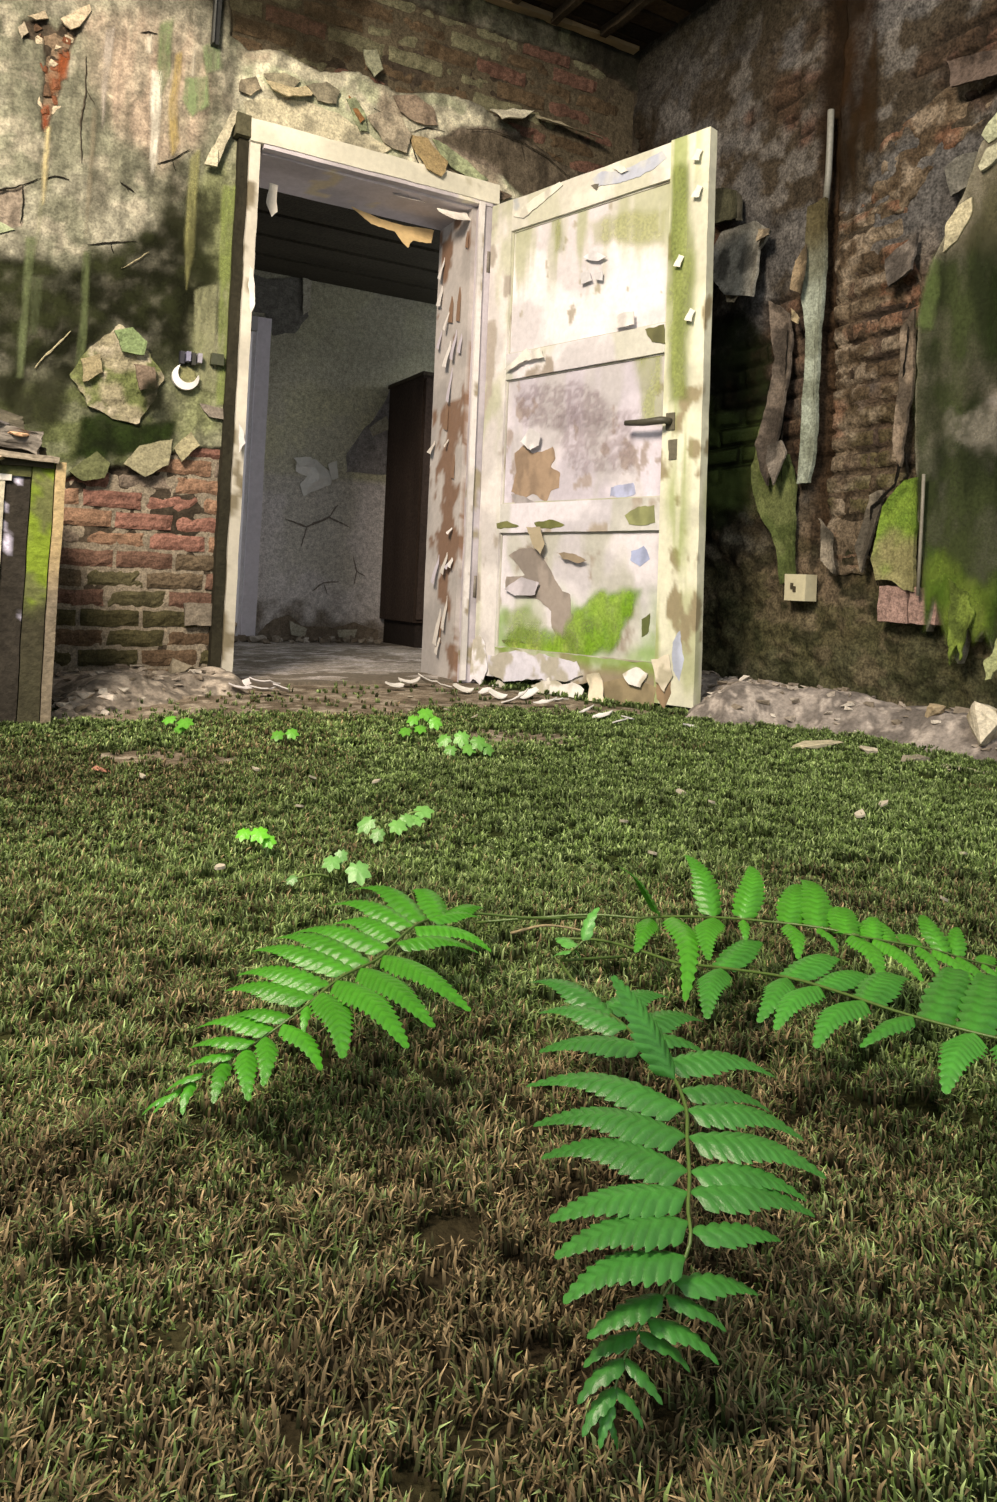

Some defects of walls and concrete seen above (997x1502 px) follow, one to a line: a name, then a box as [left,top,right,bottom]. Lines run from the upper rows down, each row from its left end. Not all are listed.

crack [0,61,95,223]
corrosion [59,54,68,78]
peeling [352,207,434,247]
peeling [392,193,471,248]
flaking render [204,0,667,218]
flaking render [69,324,164,425]
leakage [0,186,236,459]
peeling [615,311,665,344]
flaking render [691,49,997,680]
peeling [511,428,560,504]
flaking render [53,432,220,674]
peeling [467,519,684,708]